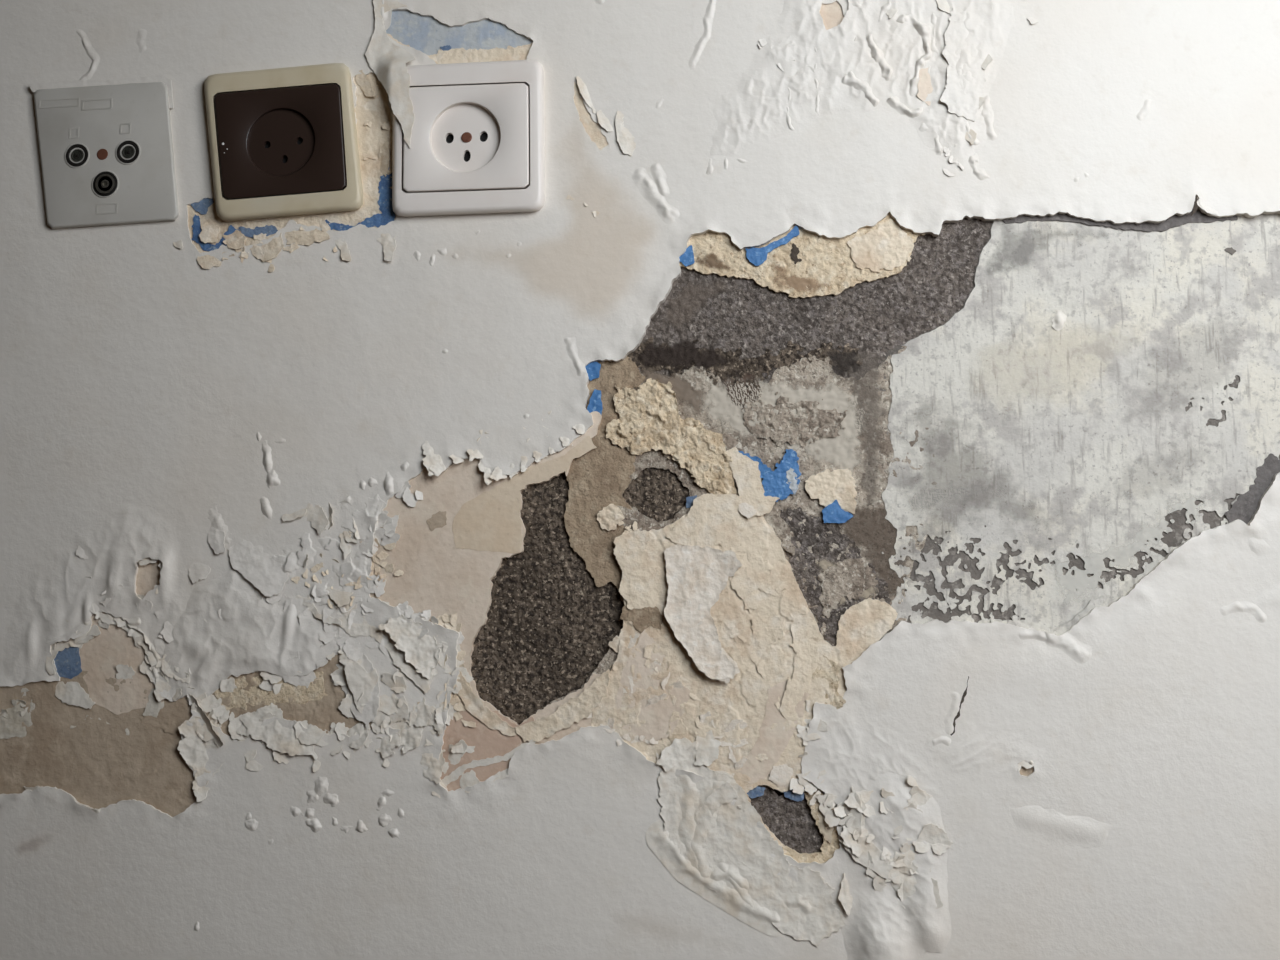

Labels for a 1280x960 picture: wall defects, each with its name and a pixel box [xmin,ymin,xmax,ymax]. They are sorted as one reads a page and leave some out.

peeling [173,0,533,272]
peeling [574,76,680,224]
peeling [706,0,1039,180]
spalling [0,208,1280,947]